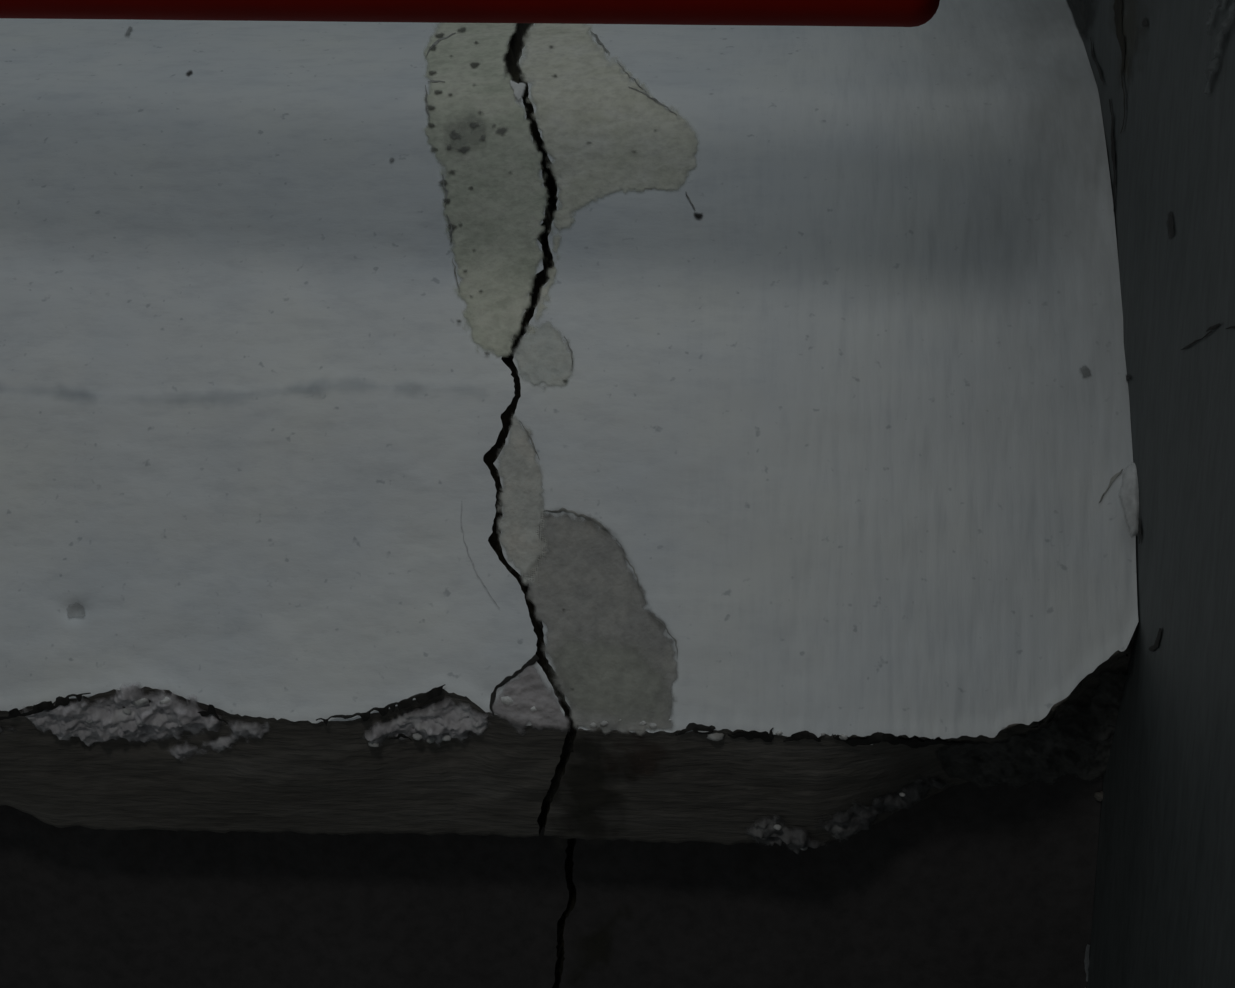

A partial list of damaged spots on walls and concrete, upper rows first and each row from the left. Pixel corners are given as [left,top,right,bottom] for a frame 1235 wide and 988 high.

peeling [424,23,703,386]
flaking render [0,684,269,759]
crack [461,23,578,988]
peeling [316,417,964,748]
flaking render [746,779,946,855]